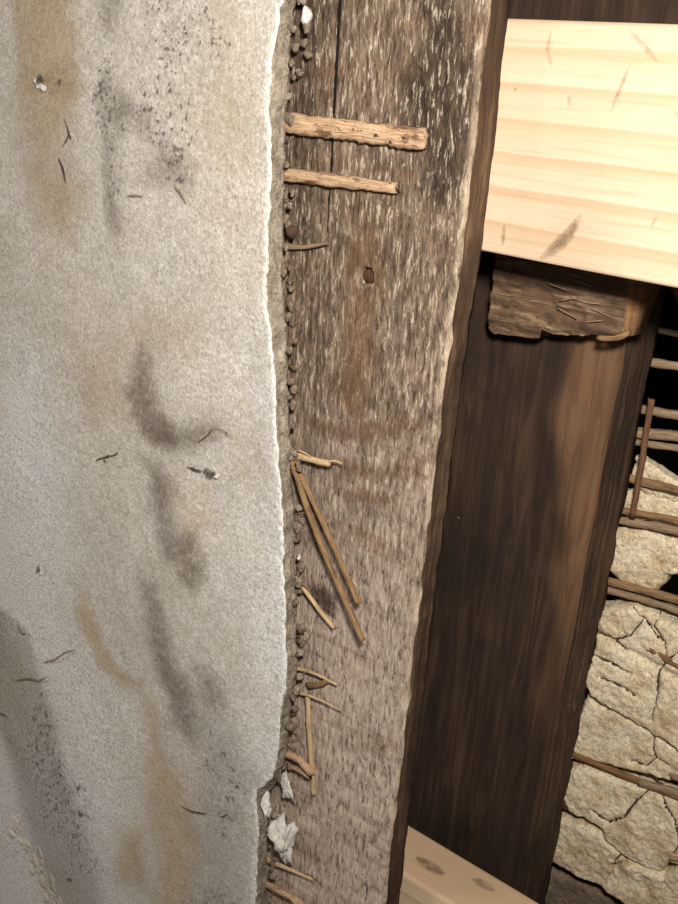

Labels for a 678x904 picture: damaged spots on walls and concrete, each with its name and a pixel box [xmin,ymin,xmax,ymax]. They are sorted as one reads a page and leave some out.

leakage [16,0,73,147]
leakage [92,0,230,207]
flaking render [289,0,314,81]
flaking render [283,188,298,252]
flaking render [292,554,313,608]
leakage [13,691,116,898]
crack [593,605,678,853]